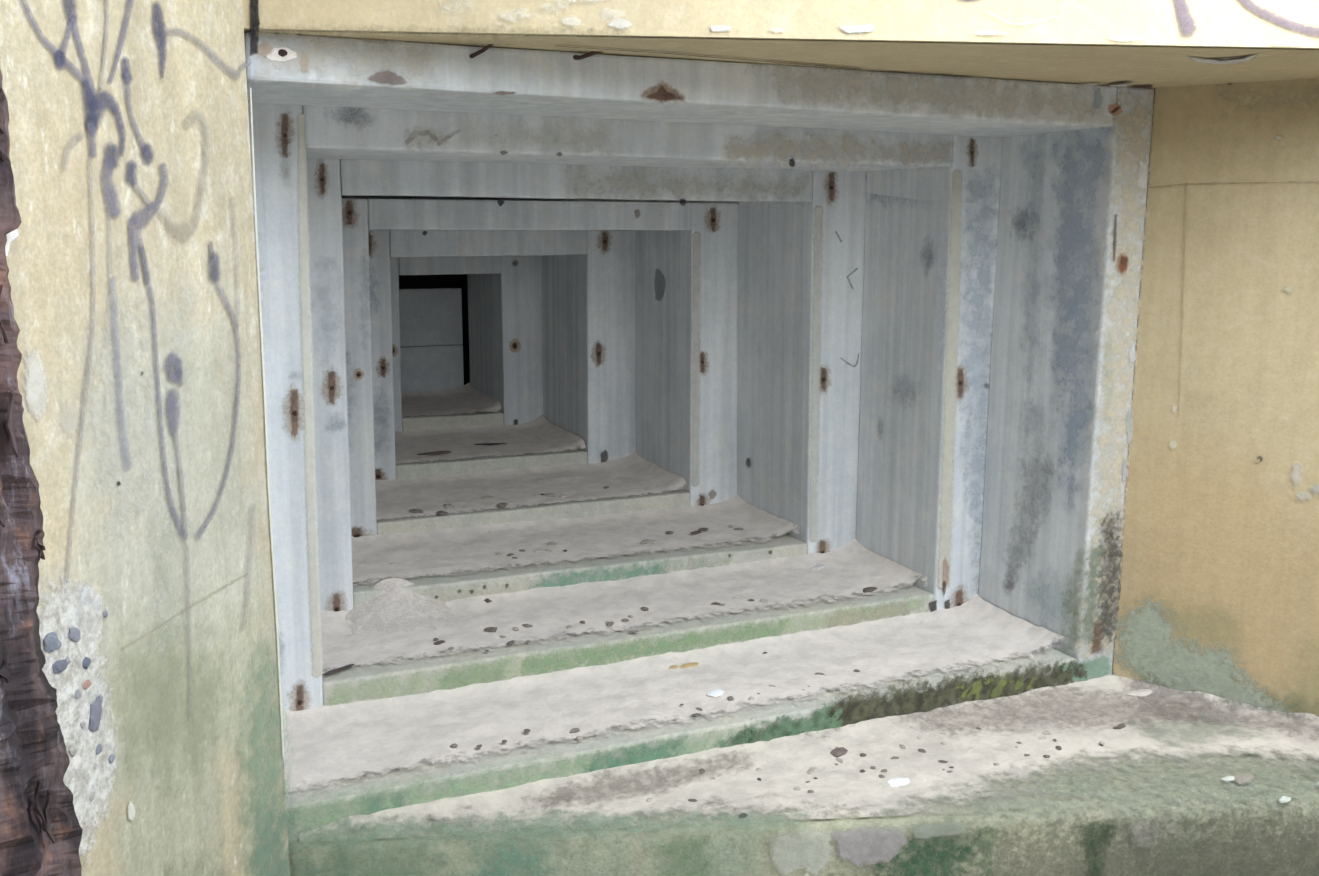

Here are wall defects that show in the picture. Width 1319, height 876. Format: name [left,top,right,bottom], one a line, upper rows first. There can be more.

corrosion [642,84,684,103]
corrosion [278,114,293,157]
corrosion [316,164,327,195]
corrosion [825,173,837,201]
corrosion [1113,215,1128,273]
water stain [1054,139,1105,462]
corrosion [325,345,397,404]
corrosion [284,389,302,437]
water stain [1083,513,1122,653]
spalling [37,575,117,863]
corrosion [291,685,307,711]
water stain [876,831,993,876]